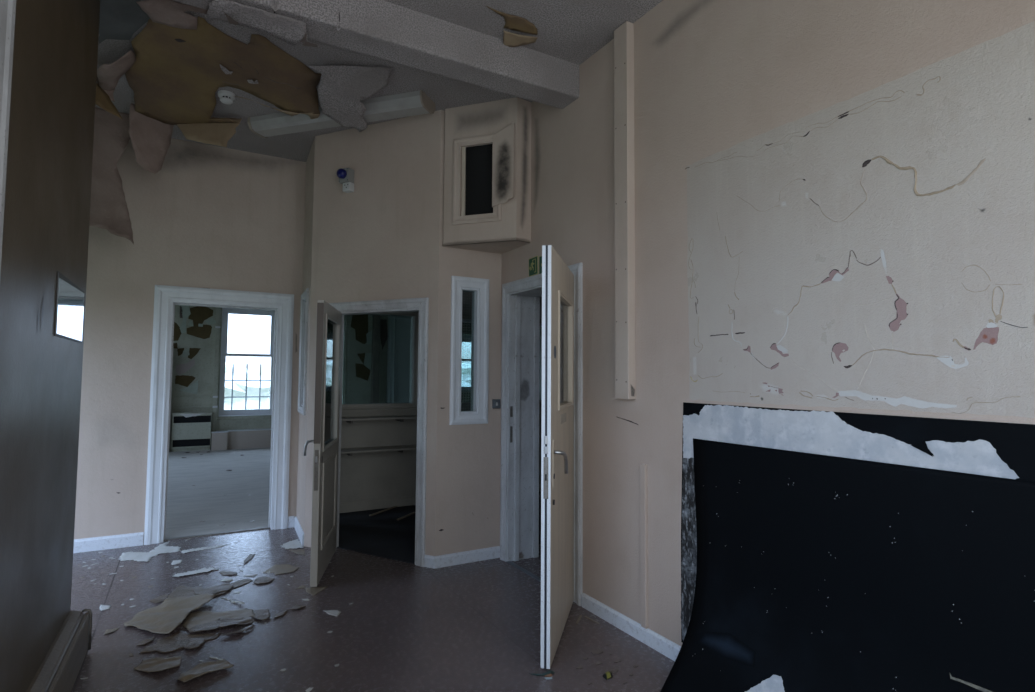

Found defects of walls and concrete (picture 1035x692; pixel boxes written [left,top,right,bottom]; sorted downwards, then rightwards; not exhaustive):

water stain [450,101,543,234]
peeling [731,316,839,398]
peeling [831,249,949,368]
peeling [964,286,1028,350]